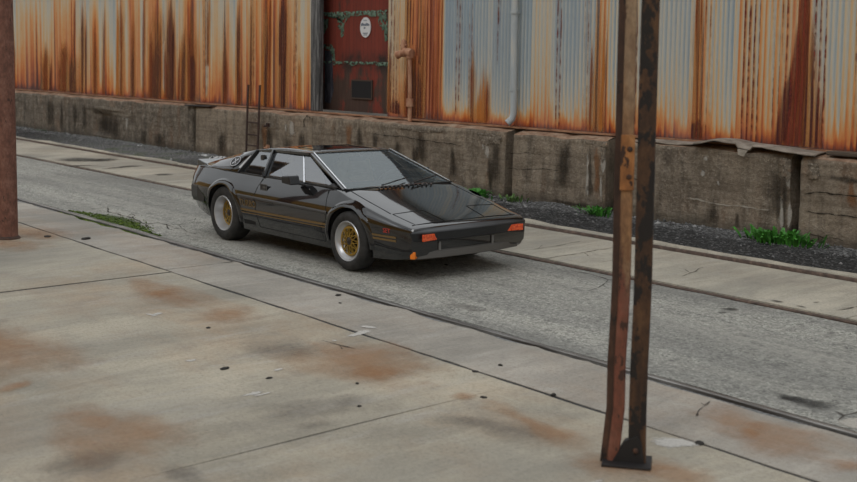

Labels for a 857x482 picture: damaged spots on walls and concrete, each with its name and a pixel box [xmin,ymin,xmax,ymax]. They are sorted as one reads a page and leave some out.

corrosion [43,12,105,95]
corrosion [116,0,210,102]
corrosion [223,0,301,109]
corrosion [387,0,443,119]
corrosion [741,0,761,142]
corrosion [772,0,827,148]
leakage [66,158,136,169]
leakage [413,136,425,163]
leakage [482,144,499,185]
leakage [586,156,605,196]
leakage [773,175,792,227]
crack [806,192,857,241]